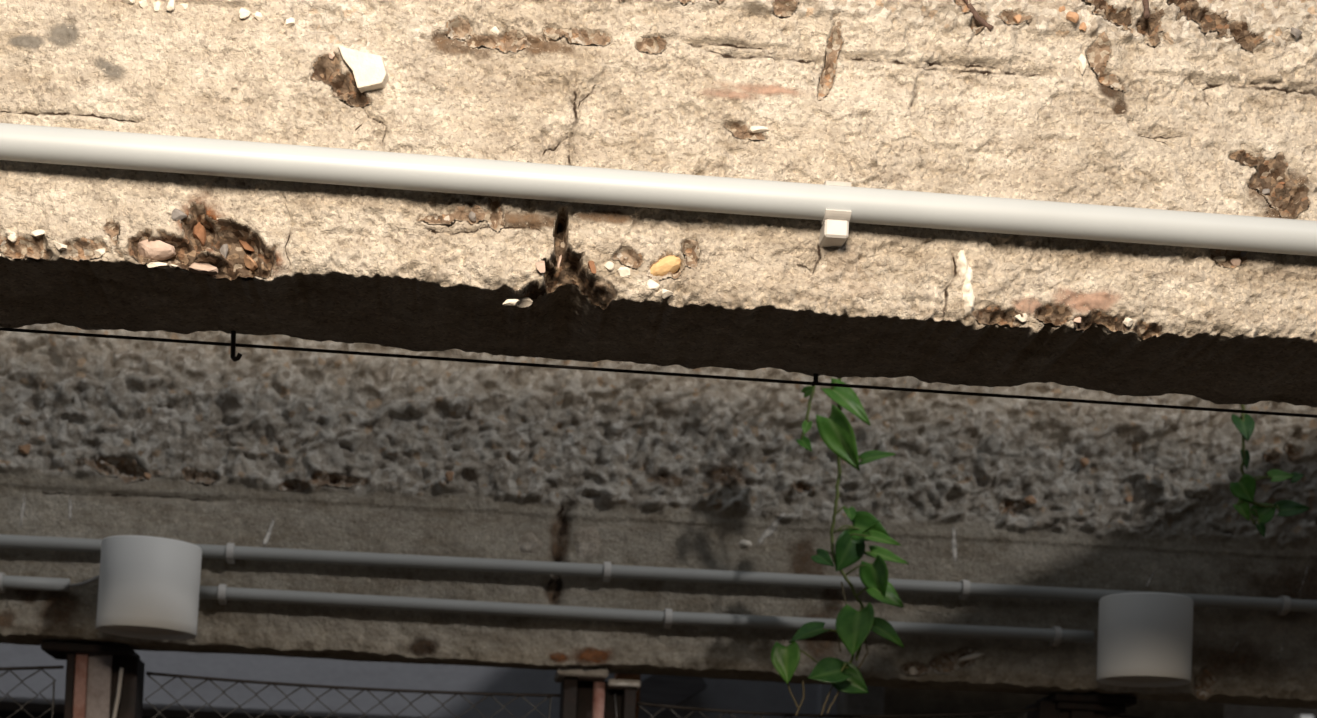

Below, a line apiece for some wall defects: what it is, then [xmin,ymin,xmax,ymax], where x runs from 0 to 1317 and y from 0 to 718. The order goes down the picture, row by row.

crack [543,85,595,165]
spalling [1229,148,1310,219]
spalling [0,202,280,280]
spalling [503,208,700,310]
spalling [964,303,1163,340]